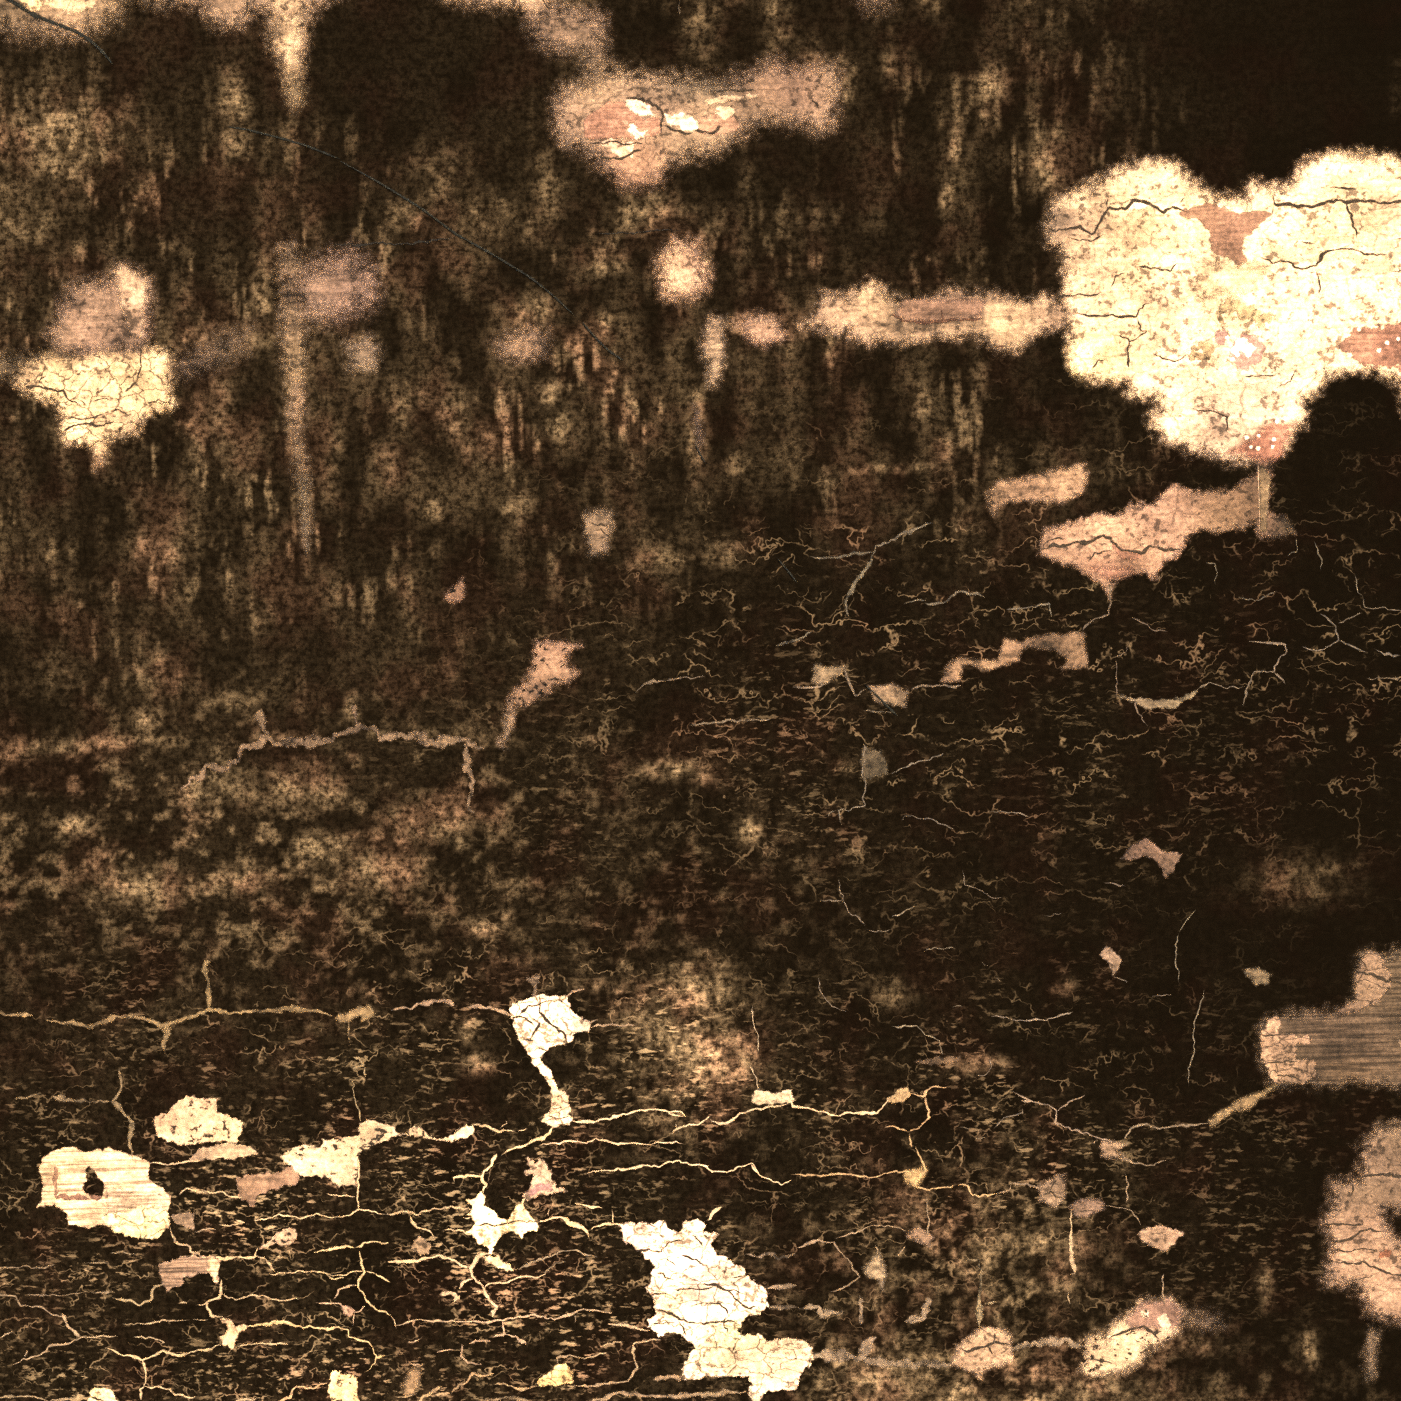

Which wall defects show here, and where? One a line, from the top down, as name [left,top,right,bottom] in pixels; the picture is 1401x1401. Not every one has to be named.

peeling [801,153,1401,593]
crack [1041,534,1274,724]
crack [1199,576,1401,705]
crack [181,705,484,813]
crack [0,960,634,1121]
peeling [509,976,590,1127]
peeling [37,1147,195,1239]
peeling [154,1095,258,1161]
peeling [236,1120,474,1207]
crack [0,1010,1207,1401]
crack [1325,1172,1401,1281]
peeling [620,1220,814,1401]